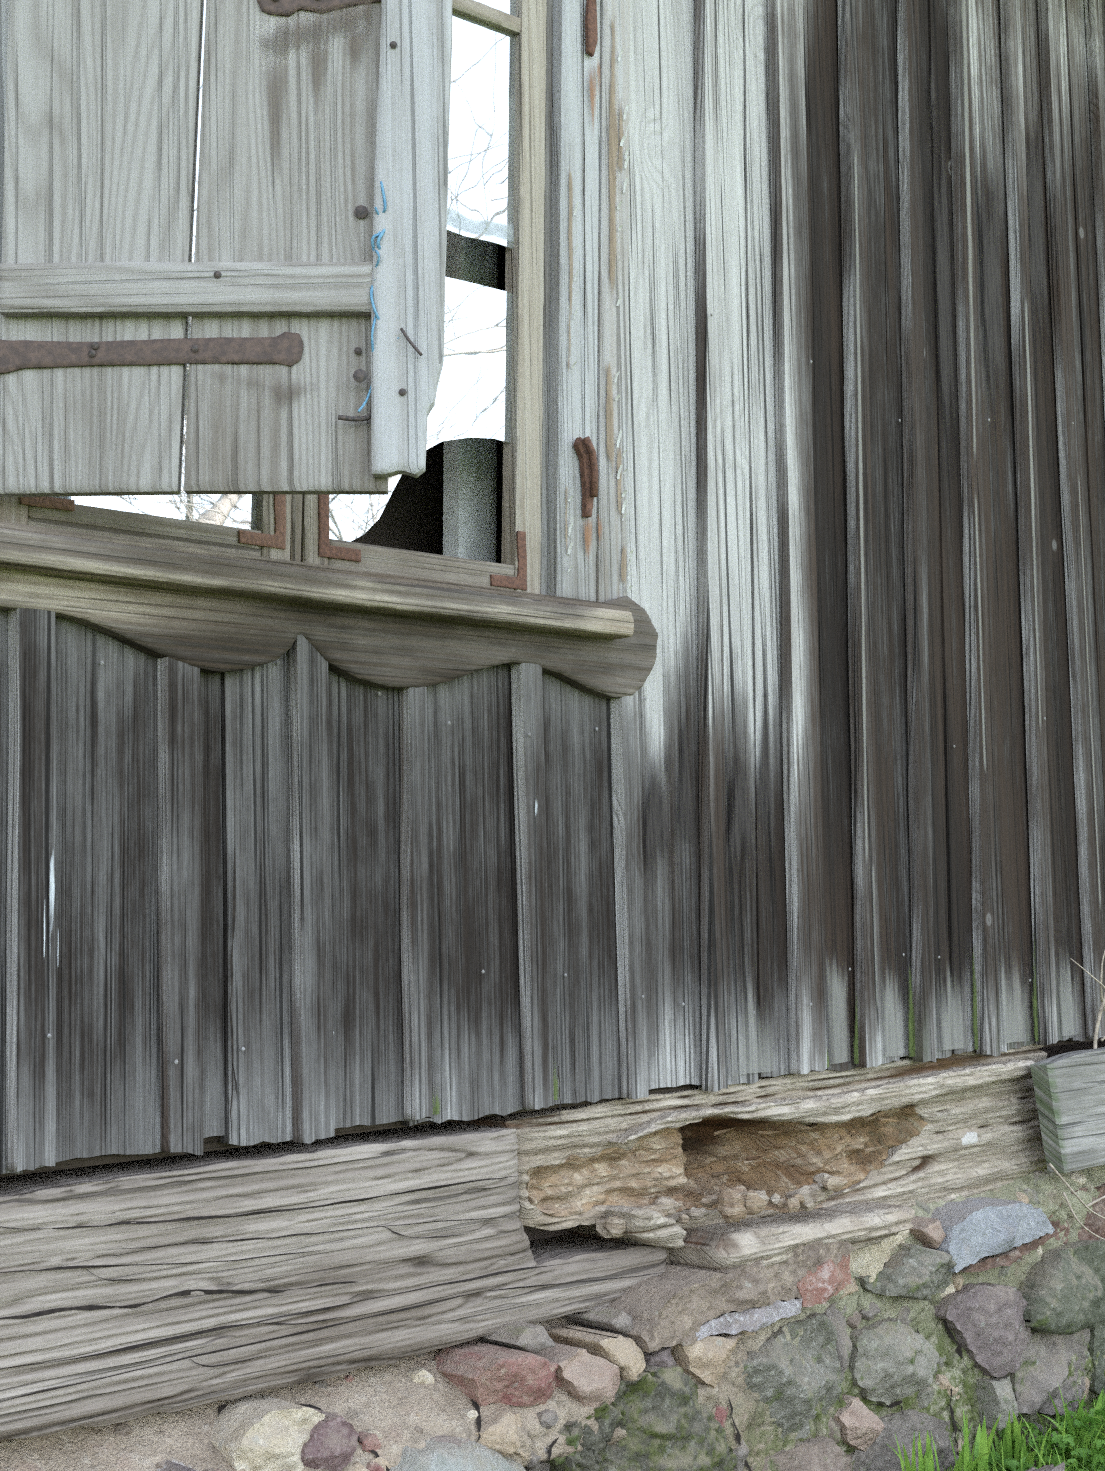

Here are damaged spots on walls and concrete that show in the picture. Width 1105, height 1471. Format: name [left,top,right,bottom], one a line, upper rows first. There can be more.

leakage [855,160,863,574]
leakage [976,506,985,762]
leakage [726,691,772,868]
leakage [740,1007,769,1074]
leakage [827,977,859,1068]
leakage [885,977,915,1057]
leakage [943,966,978,1050]
leakage [1003,971,1038,1043]
crack [0,1176,665,1402]
crack [295,1403,323,1411]
crack [358,1436,390,1471]
crack [471,1399,486,1442]